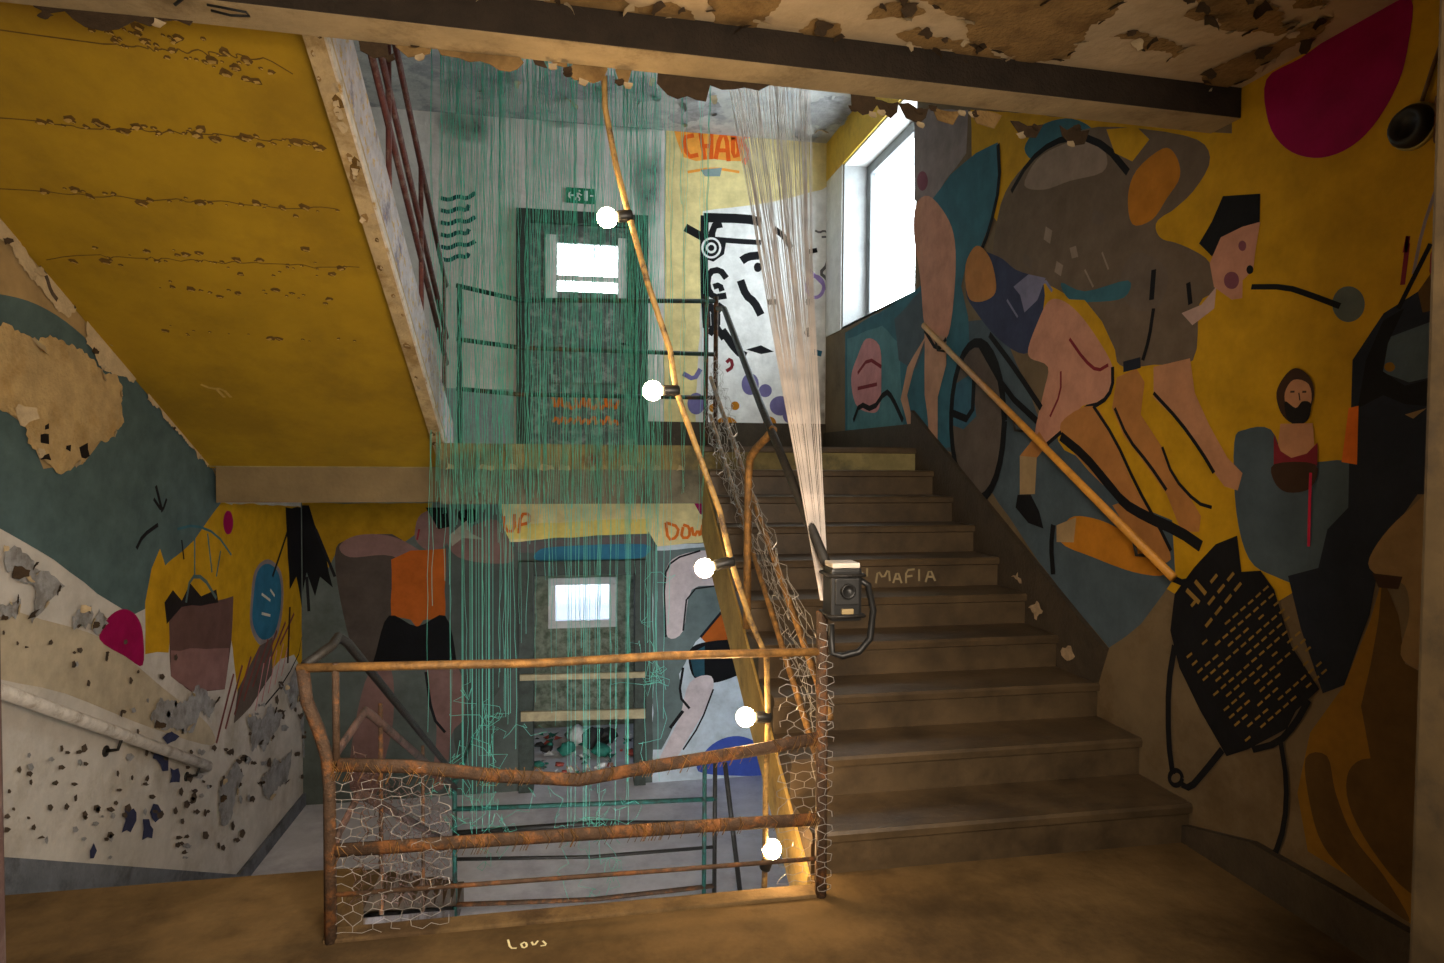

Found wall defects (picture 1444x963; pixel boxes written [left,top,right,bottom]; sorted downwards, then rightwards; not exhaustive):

peeling [0,5,293,85]
peeling [544,0,781,35]
peeling [799,18,845,43]
peeling [866,0,1126,66]
peeling [1114,30,1196,62]
flaking render [0,219,360,474]
peeling [0,545,65,648]
peeling [72,605,108,636]
peeling [17,667,306,859]
peeling [4,789,48,844]